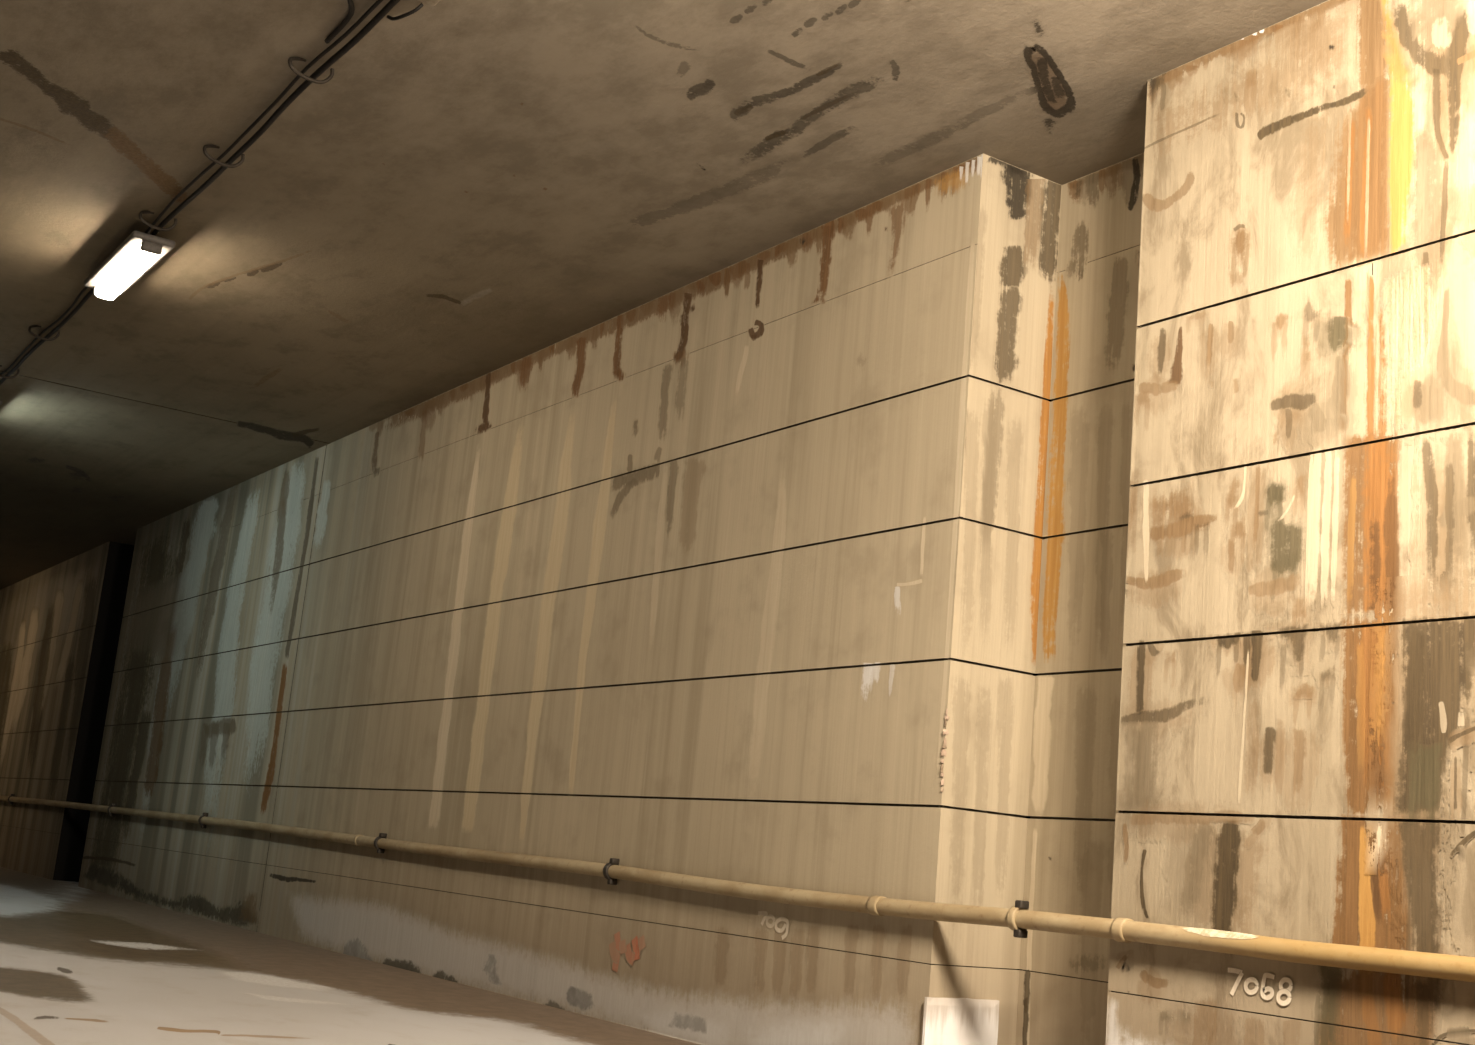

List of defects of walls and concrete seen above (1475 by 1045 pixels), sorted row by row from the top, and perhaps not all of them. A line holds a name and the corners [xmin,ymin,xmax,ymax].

corrosion [811,220,836,305]
corrosion [886,163,971,277]
corrosion [656,293,696,445]
leakage [368,0,1475,957]
corrosion [1029,271,1071,817]
corrosion [1322,0,1418,950]
corrosion [260,453,319,817]
leakage [0,458,361,1006]
leakage [285,887,923,1045]
leakage [1066,935,1351,1045]
corrosion [1318,969,1436,1045]
leakage [1394,974,1474,1045]